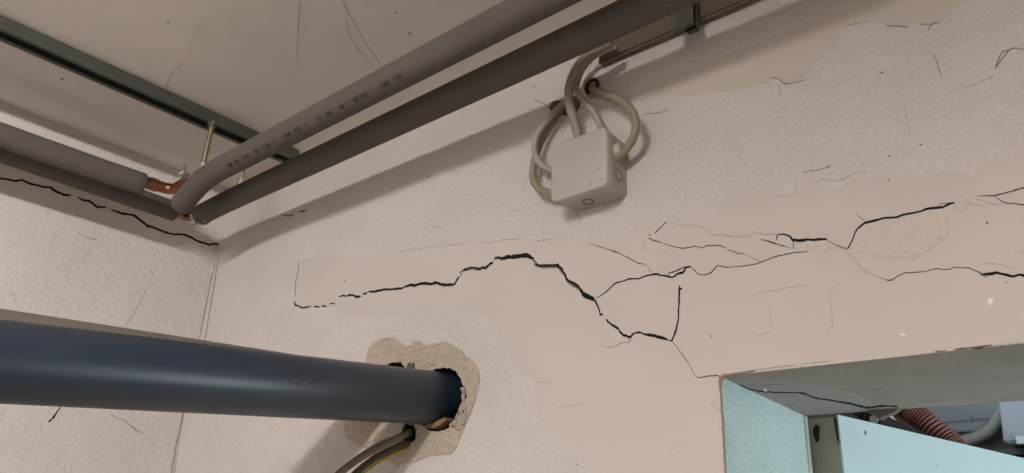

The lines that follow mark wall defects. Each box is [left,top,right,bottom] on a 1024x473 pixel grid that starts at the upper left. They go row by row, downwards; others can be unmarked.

crack [0,177,219,340]
crack [294,187,1024,410]
crack [111,413,184,473]
peeling [344,337,480,468]